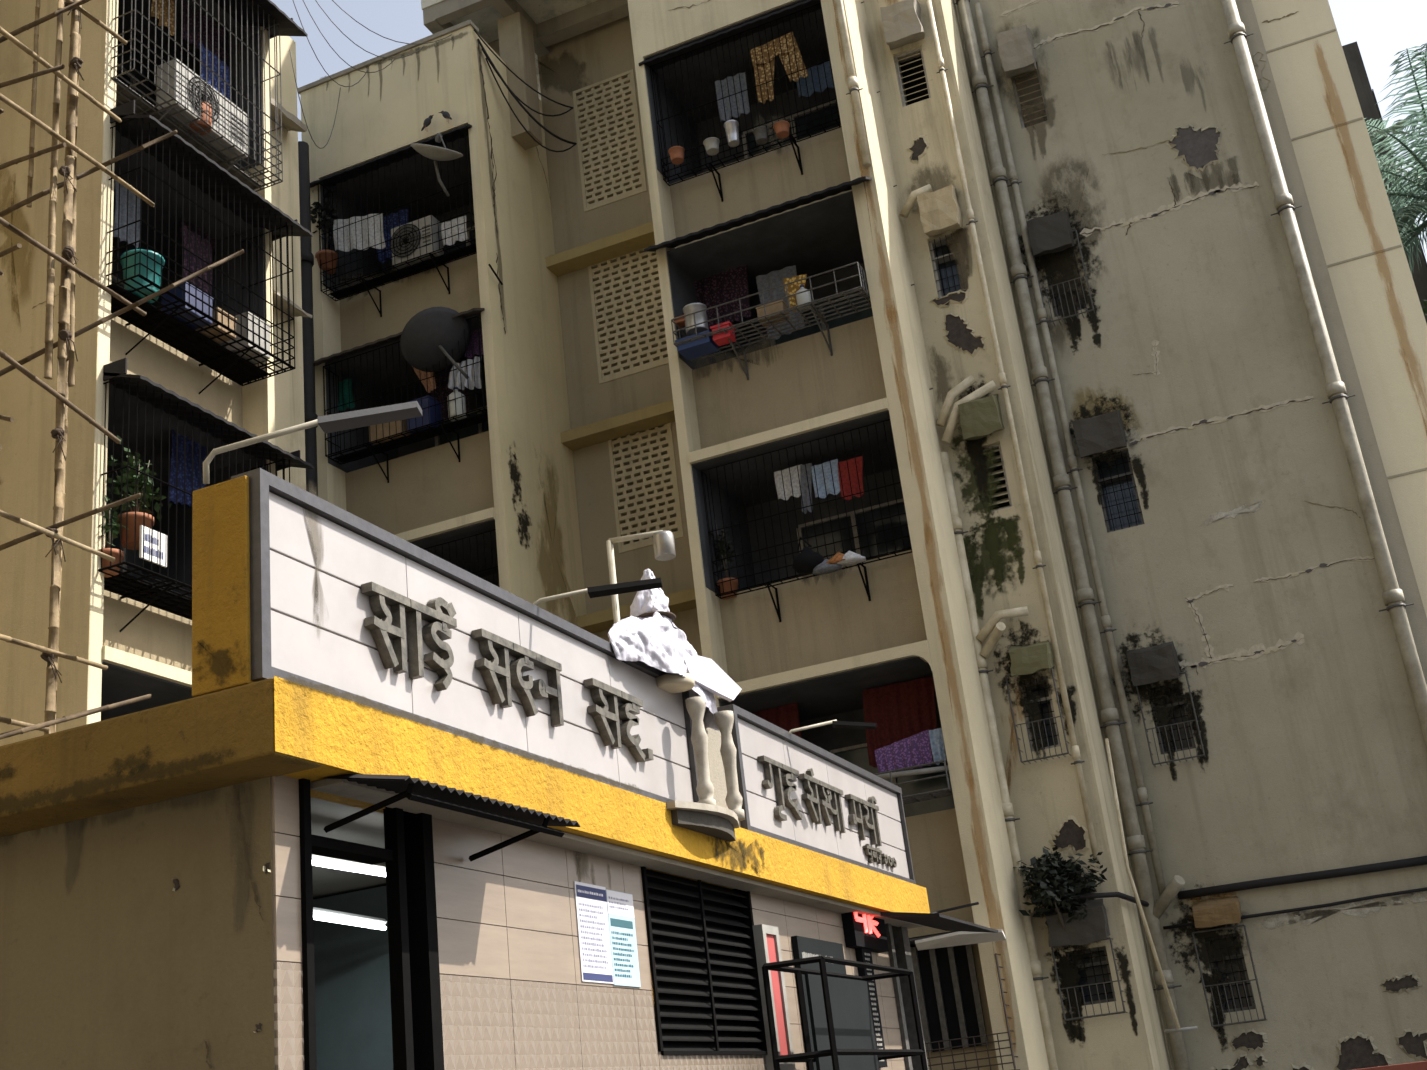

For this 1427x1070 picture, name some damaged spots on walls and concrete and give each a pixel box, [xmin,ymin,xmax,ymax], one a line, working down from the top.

crack [1034,0,1179,50]
flaking render [1167,124,1222,173]
crack [1080,181,1259,237]
flaking render [930,289,986,357]
water stain [1058,288,1101,352]
crack [1130,396,1314,445]
water stain [967,437,989,502]
water stain [963,516,1025,619]
crack [1179,556,1374,675]
flaking render [1380,971,1422,995]
flaking render [1208,1028,1269,1070]
flaking render [1334,1028,1427,1070]